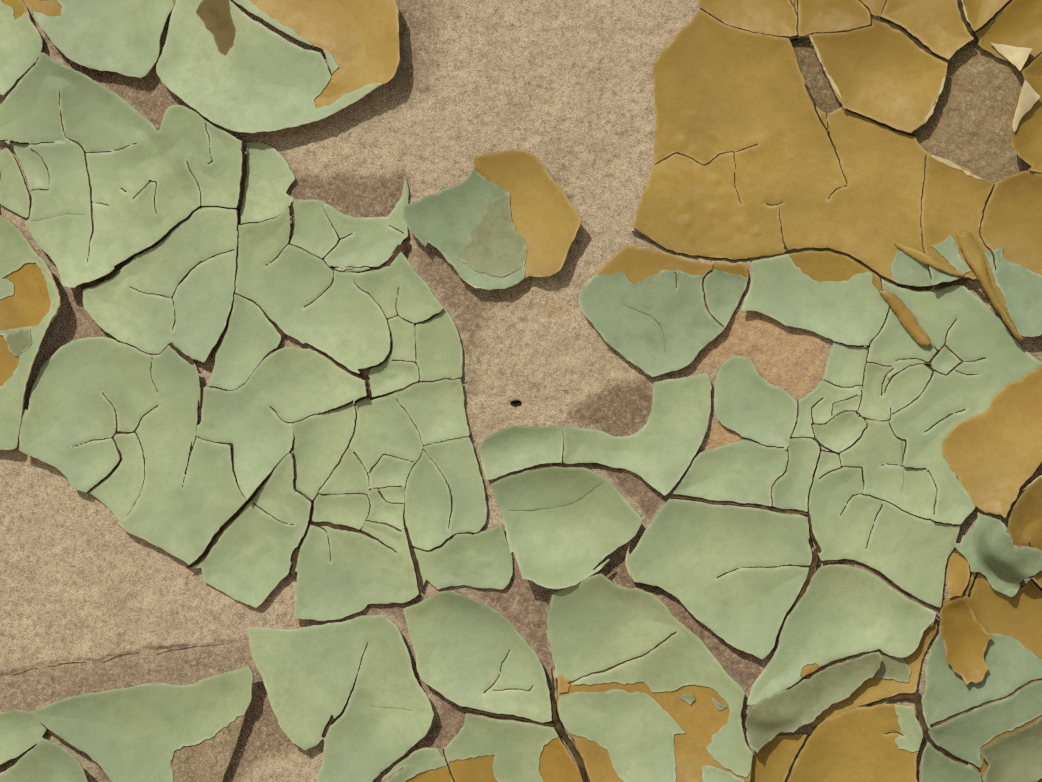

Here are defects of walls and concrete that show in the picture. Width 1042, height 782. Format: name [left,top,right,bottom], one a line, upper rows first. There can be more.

crack [700,0,949,63]
crack [958,0,1012,42]
crack [1,91,474,591]
peeling [0,0,812,782]
peeling [477,0,1042,782]
crack [632,85,996,652]
crack [868,679,1042,765]